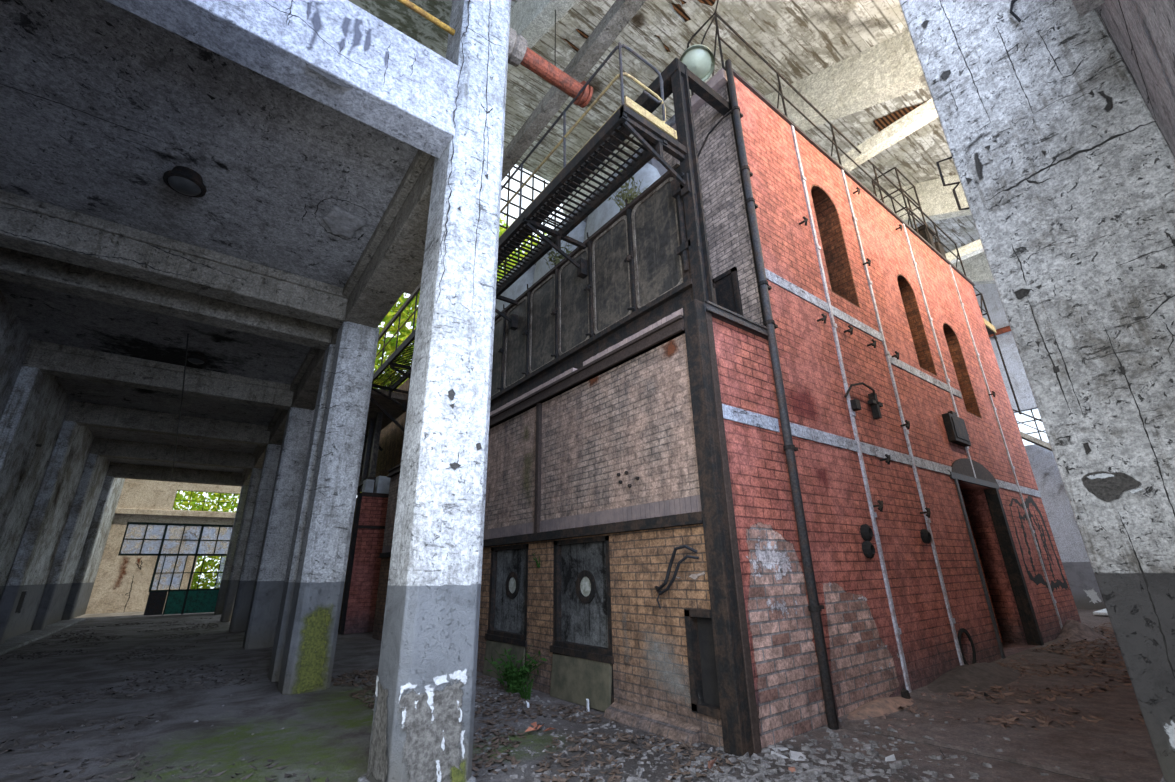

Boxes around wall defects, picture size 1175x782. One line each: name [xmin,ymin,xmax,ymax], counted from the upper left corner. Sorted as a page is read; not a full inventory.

spalling [672,0,716,22]
peeling [306,63,352,88]
spalling [873,100,928,132]
crack [985,0,1156,201]
spalling [1082,471,1143,502]
peeling [367,669,467,782]
peeling [1164,720,1175,749]